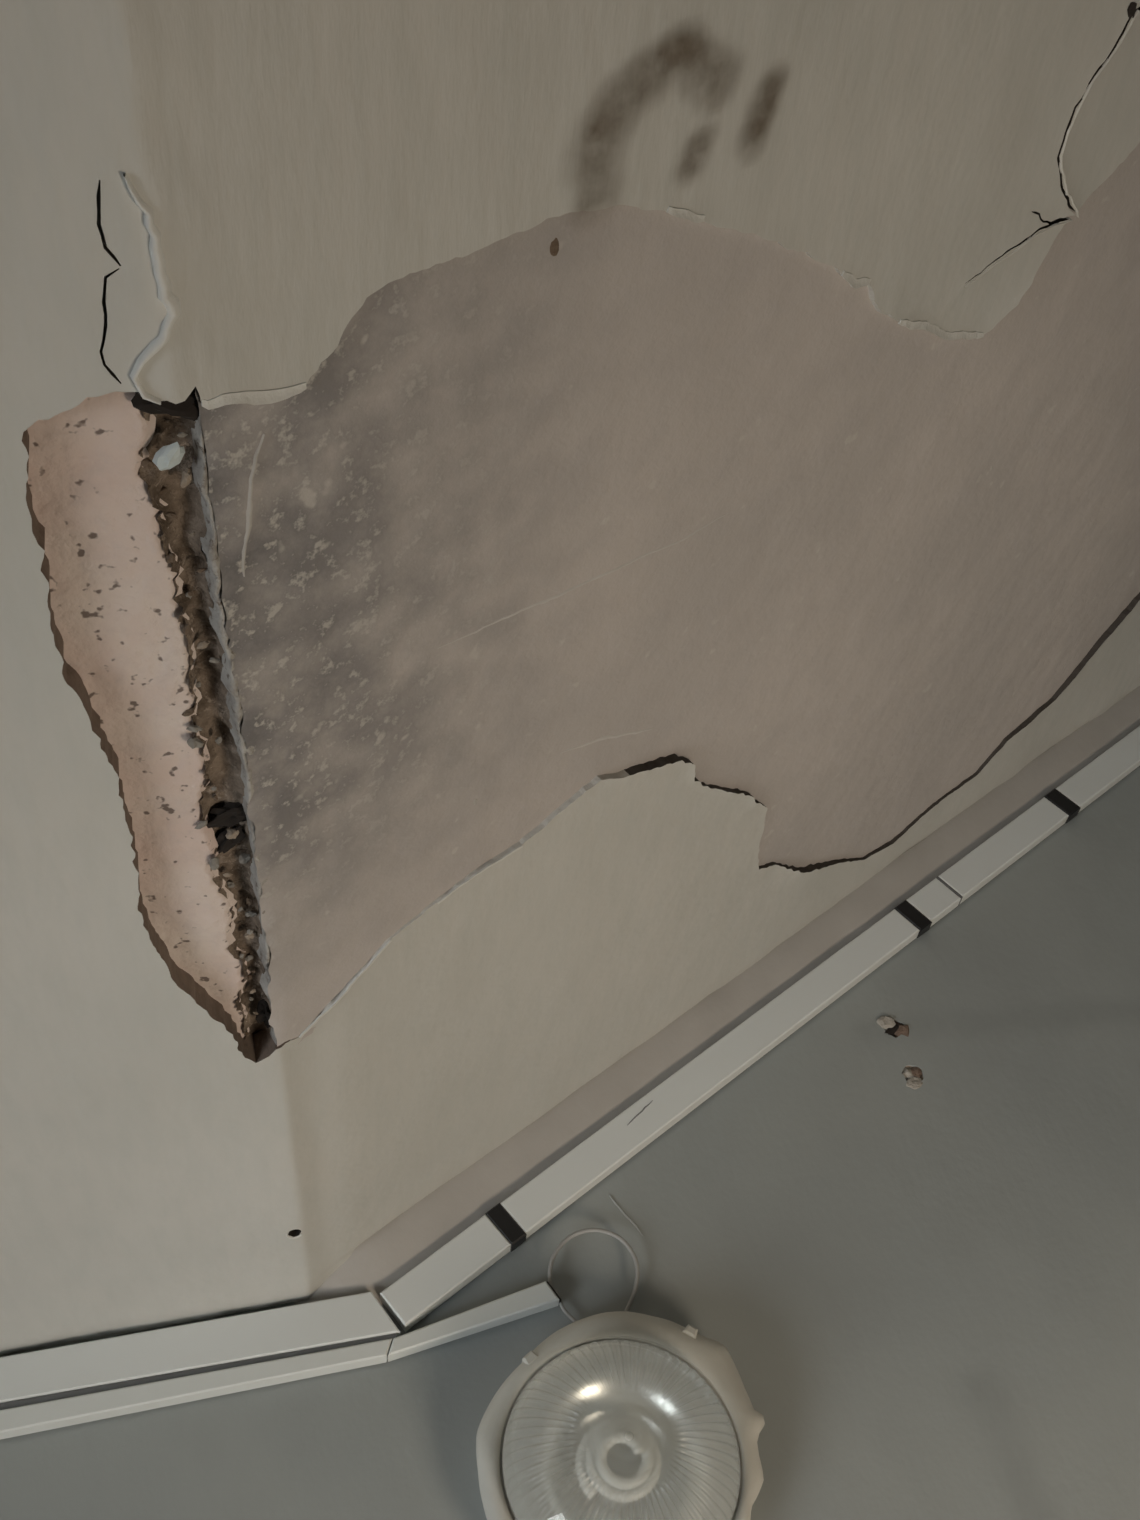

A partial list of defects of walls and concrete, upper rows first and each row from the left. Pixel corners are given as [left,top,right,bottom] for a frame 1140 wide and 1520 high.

peeling [27,142,1140,1047]
crack [964,2,1140,287]